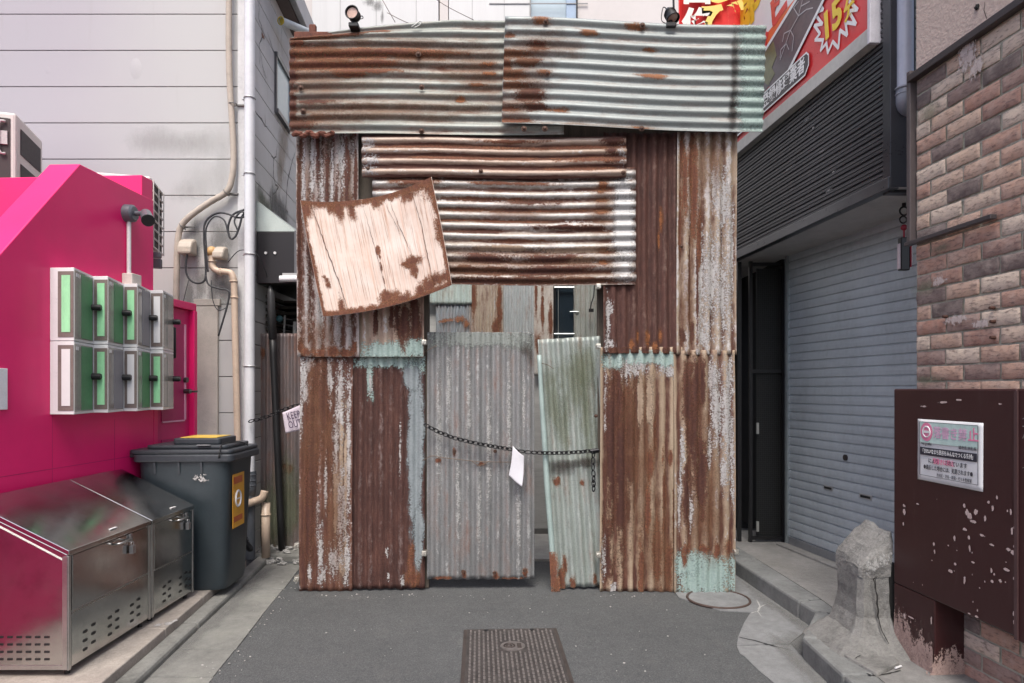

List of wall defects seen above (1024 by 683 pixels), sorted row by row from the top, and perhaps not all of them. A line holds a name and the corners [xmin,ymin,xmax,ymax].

corrosion [282,30,629,586]
corrosion [549,552,575,592]
corrosion [593,134,732,591]
crack [873,577,889,644]